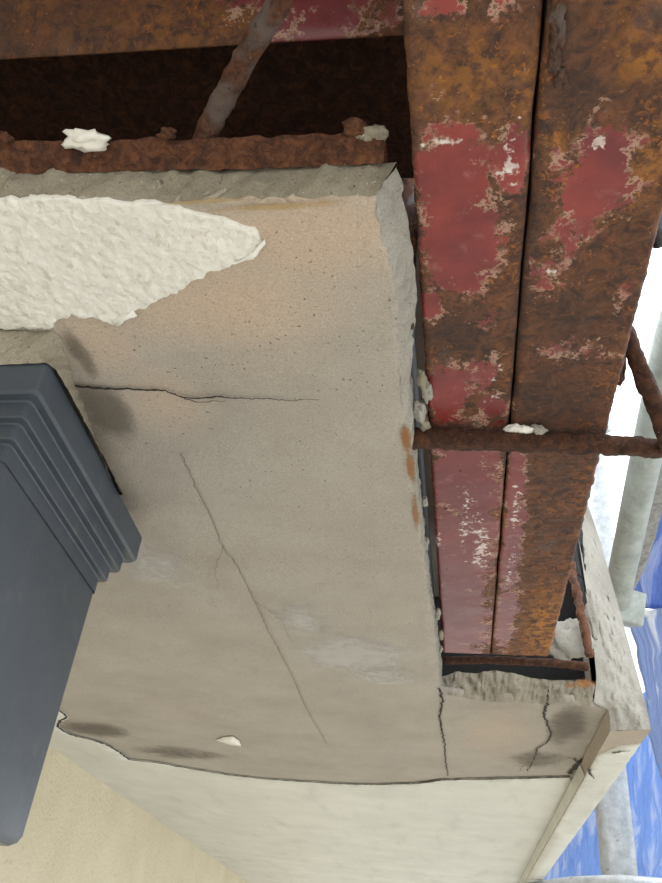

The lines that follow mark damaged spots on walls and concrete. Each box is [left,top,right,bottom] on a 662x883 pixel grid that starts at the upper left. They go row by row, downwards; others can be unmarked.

crack [75,385,319,403]
peeling [0,162,595,706]
rust [401,427,415,479]
rust [618,356,627,386]
crack [180,454,327,744]
water stain [74,726,119,735]
crack [438,688,448,776]
crack [517,680,552,774]
peeling [49,709,640,883]